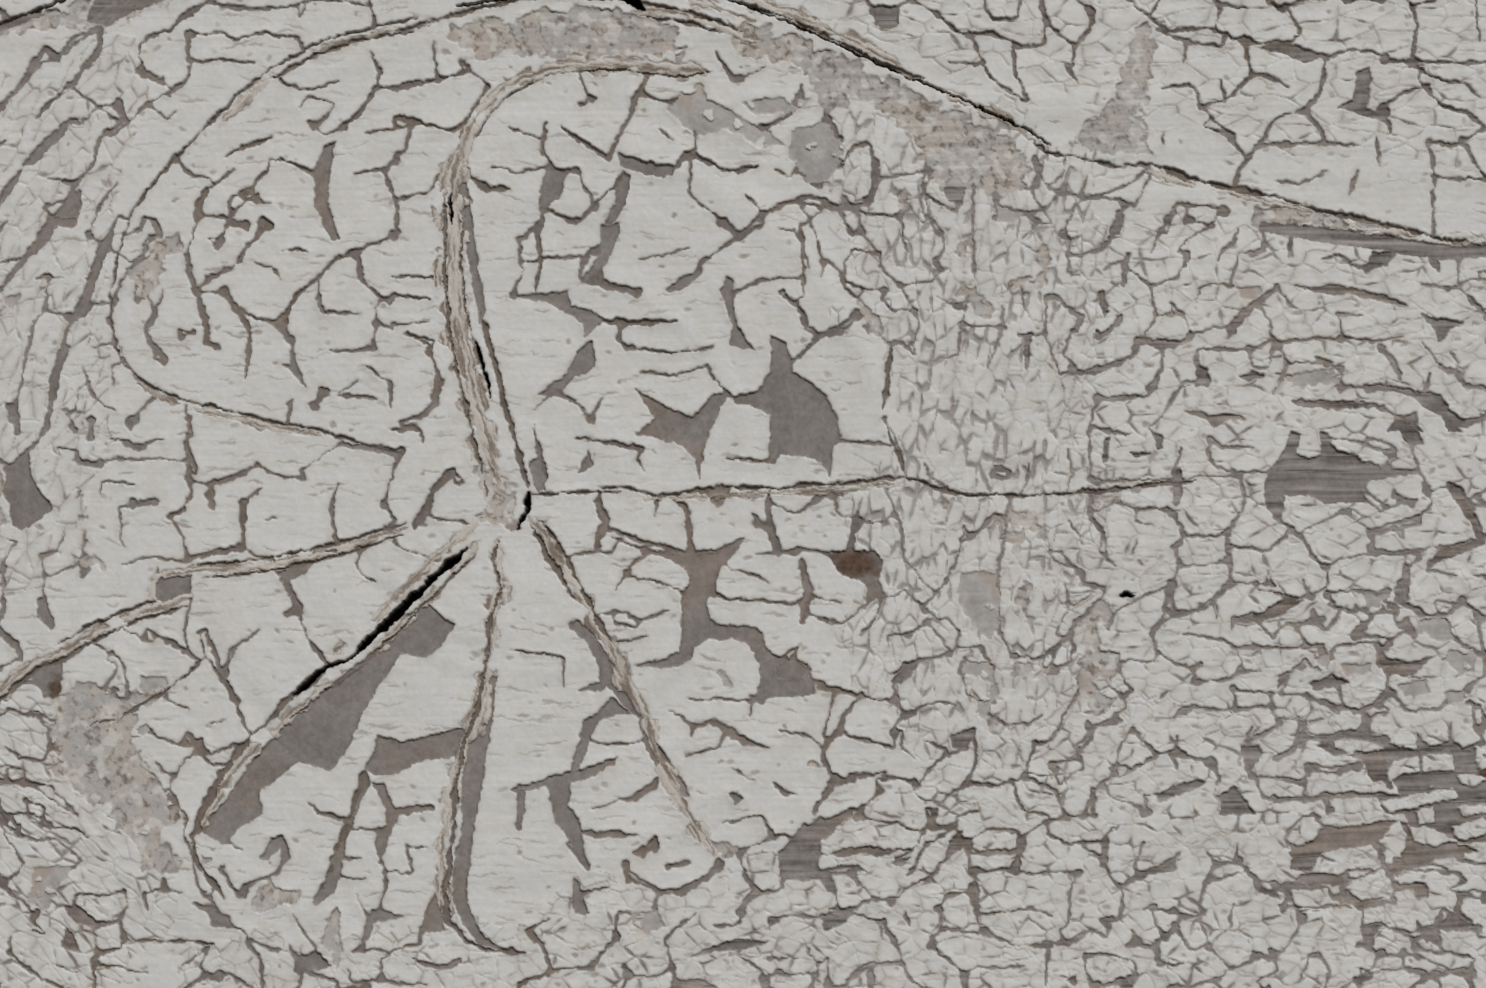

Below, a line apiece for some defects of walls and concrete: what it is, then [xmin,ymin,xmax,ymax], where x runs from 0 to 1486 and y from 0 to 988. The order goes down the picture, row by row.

crack [492,122,643,300]
peeling [0,454,53,531]
crack [598,316,746,405]
peeling [635,277,842,508]
crack [1194,297,1486,478]
peeling [1264,432,1418,524]
peeling [1388,373,1467,446]
peeling [594,502,815,705]
crack [0,799,340,988]
peeling [202,604,466,971]
crack [309,770,380,891]
crack [1075,844,1486,988]